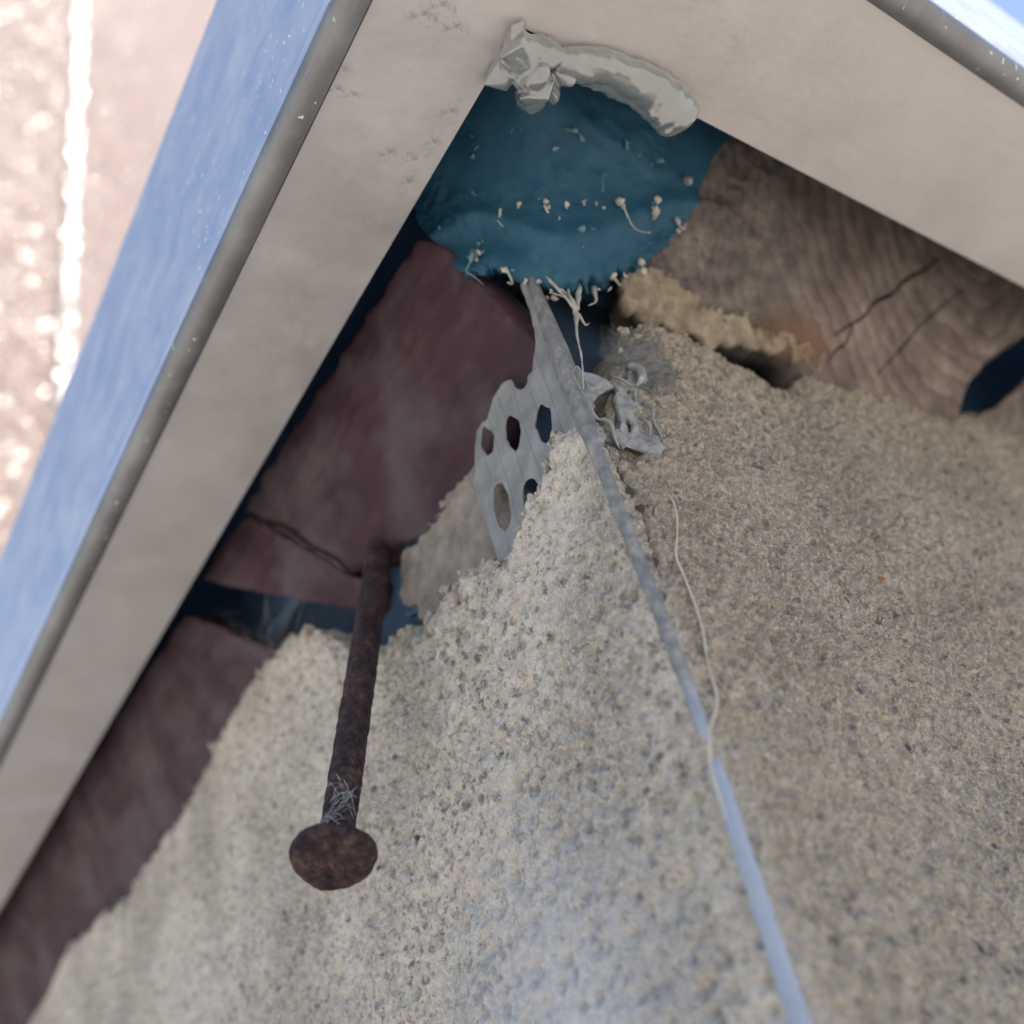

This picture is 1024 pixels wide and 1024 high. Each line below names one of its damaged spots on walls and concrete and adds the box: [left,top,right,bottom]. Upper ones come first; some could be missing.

spalling [612,324,653,360]
crack [828,257,939,362]
crack [877,288,964,375]
spalling [537,430,557,494]
crack [245,511,352,573]
spalling [379,512,527,653]